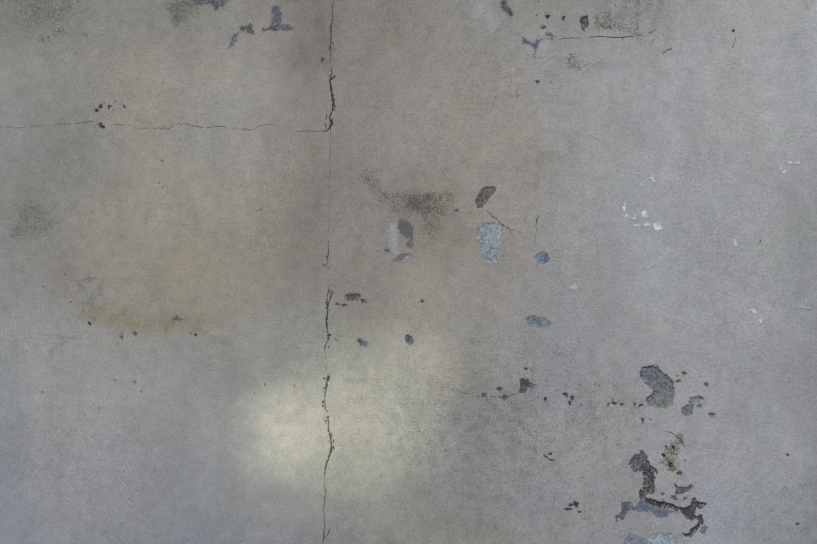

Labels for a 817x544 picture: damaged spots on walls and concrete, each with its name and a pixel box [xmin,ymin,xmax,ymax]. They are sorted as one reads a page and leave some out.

peeling [228,5,296,49]
peeling [523,14,556,55]
crack [300,3,336,154]
flaking render [475,186,496,208]
peeling [384,219,415,261]
flaking render [476,221,502,264]
flaking render [534,251,550,264]
flaking render [336,293,370,306]
flaking render [526,315,551,328]
crack [322,189,339,544]
flaking render [607,365,704,416]
flaking render [615,446,707,544]